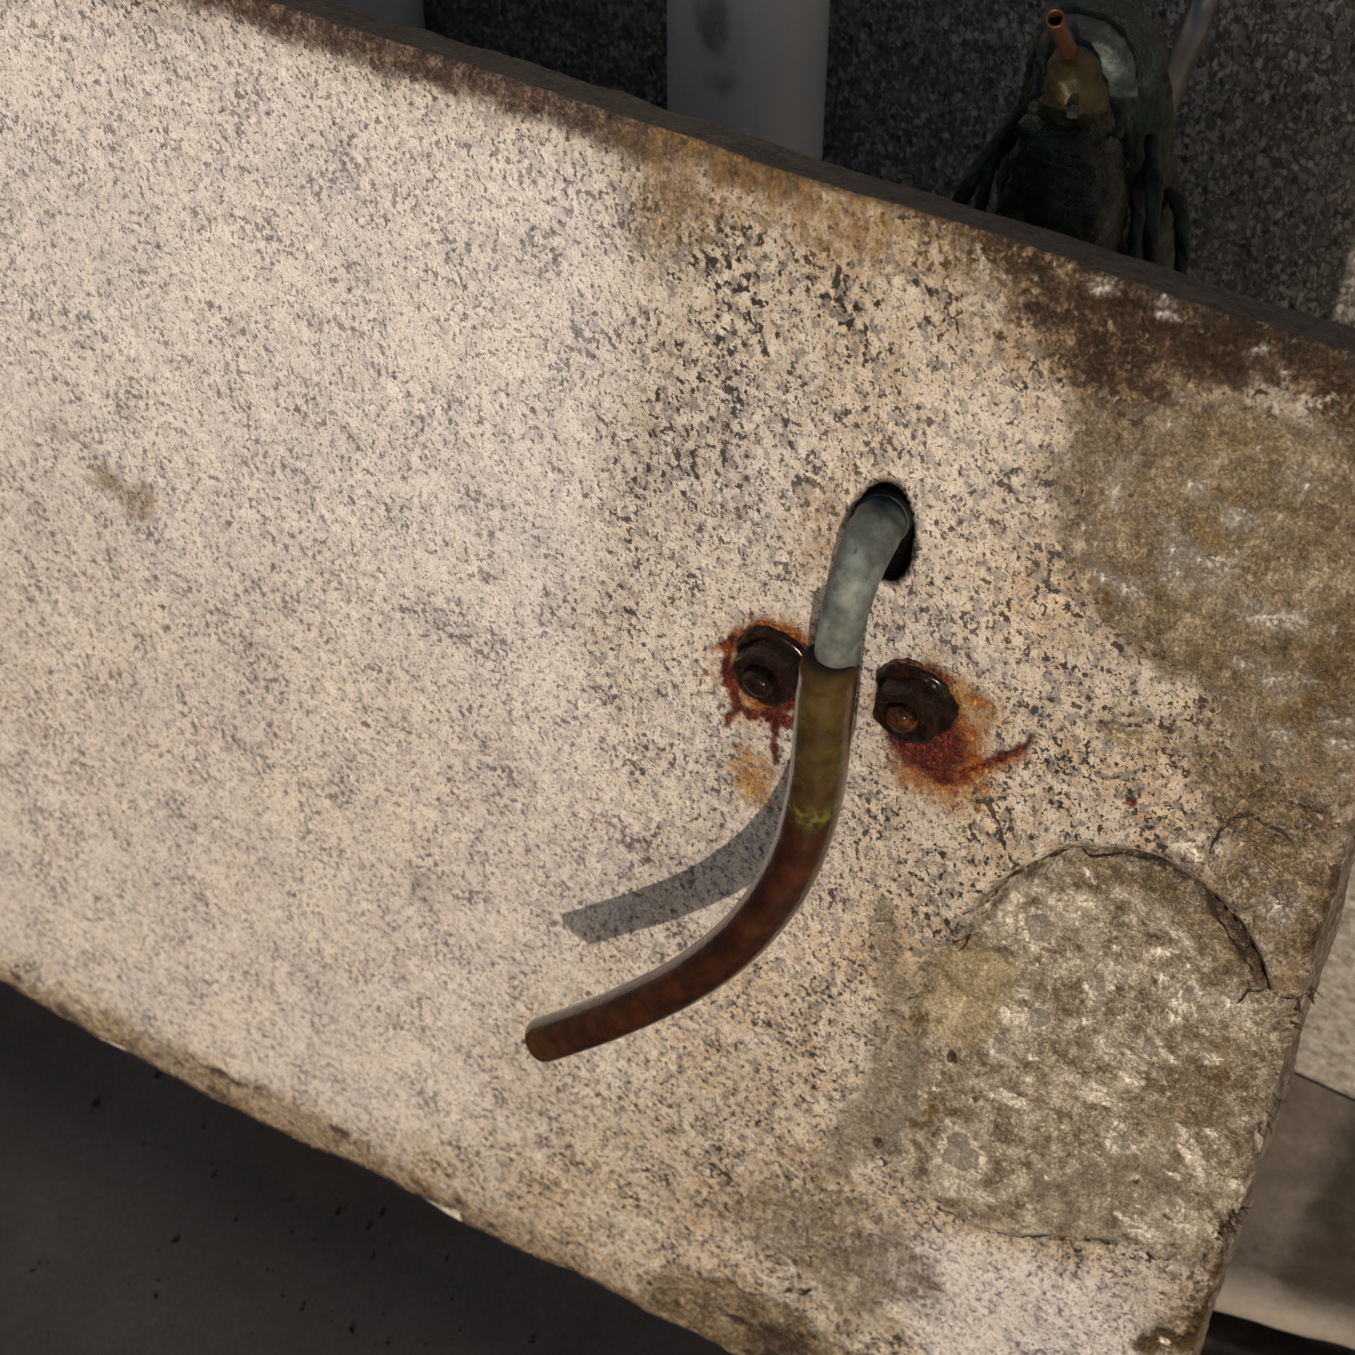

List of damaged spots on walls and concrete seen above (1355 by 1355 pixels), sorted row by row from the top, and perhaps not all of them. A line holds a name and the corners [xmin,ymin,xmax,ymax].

corrosion [710,616,815,807]
corrosion [884,664,1035,807]
spalling [873,824,1298,1266]